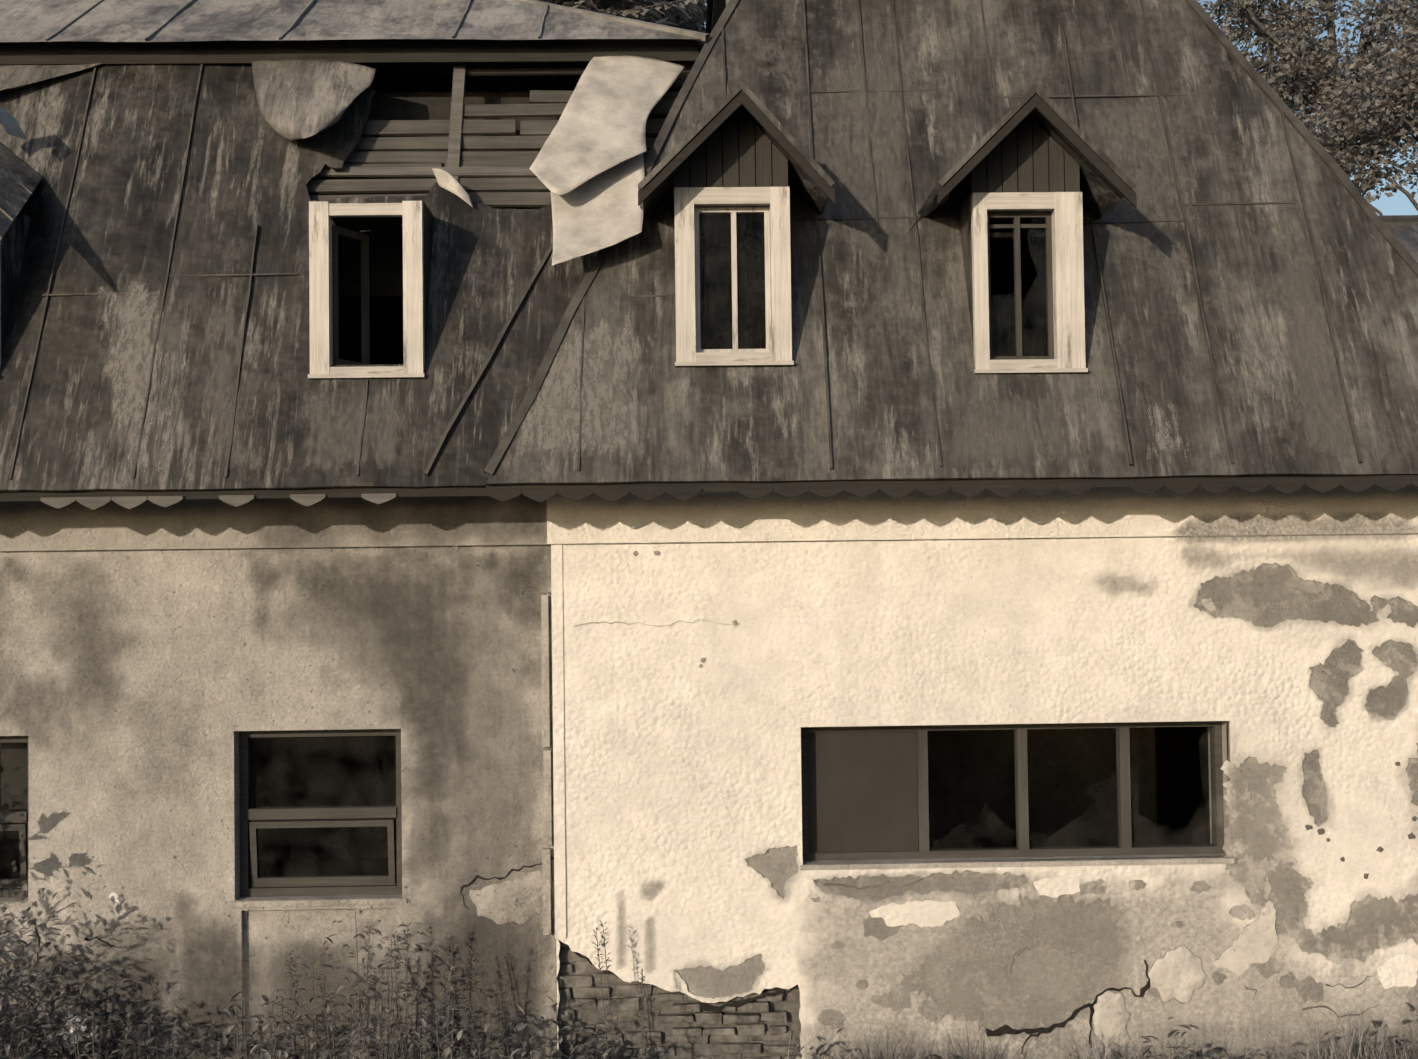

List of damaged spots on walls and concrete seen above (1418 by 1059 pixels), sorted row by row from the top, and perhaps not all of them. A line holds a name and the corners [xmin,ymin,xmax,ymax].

flaking render [1193,563,1418,727]
damp [70,935,239,1059]
damp [283,955,384,1059]
flaking render [555,944,801,1059]
flaking render [745,845,1150,1035]
crack [986,960,1150,1054]
flaking render [1190,880,1212,894]
flaking render [1211,743,1418,1002]